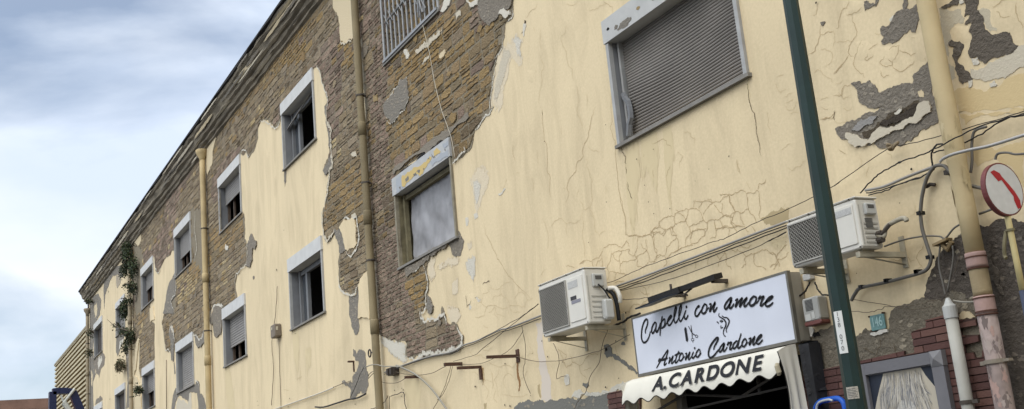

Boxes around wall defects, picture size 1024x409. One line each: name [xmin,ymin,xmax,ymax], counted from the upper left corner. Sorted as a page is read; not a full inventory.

spalling [89,0,514,409]
crack [505,1,845,312]
crack [776,6,915,120]
spalling [835,62,939,149]
spalling [940,0,1024,84]
spalling [800,325,840,369]
spalling [856,234,983,361]
spalling [980,218,1024,409]